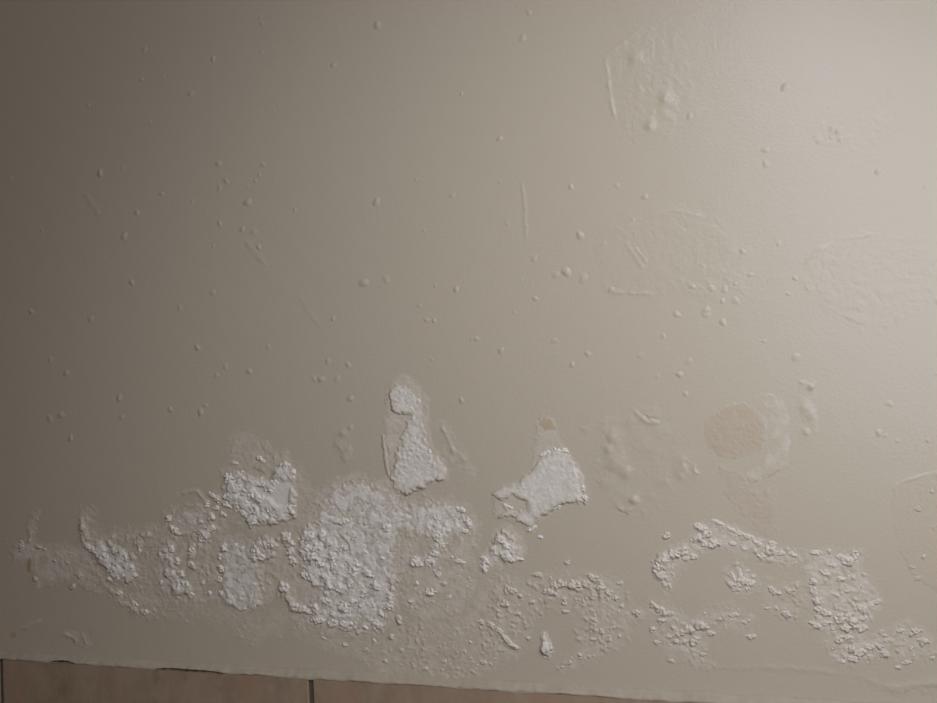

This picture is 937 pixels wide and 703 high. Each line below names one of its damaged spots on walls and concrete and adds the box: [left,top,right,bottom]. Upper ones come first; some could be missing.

peeling [381,373,451,496]
peeling [490,414,589,539]
water stain [75,426,937,679]